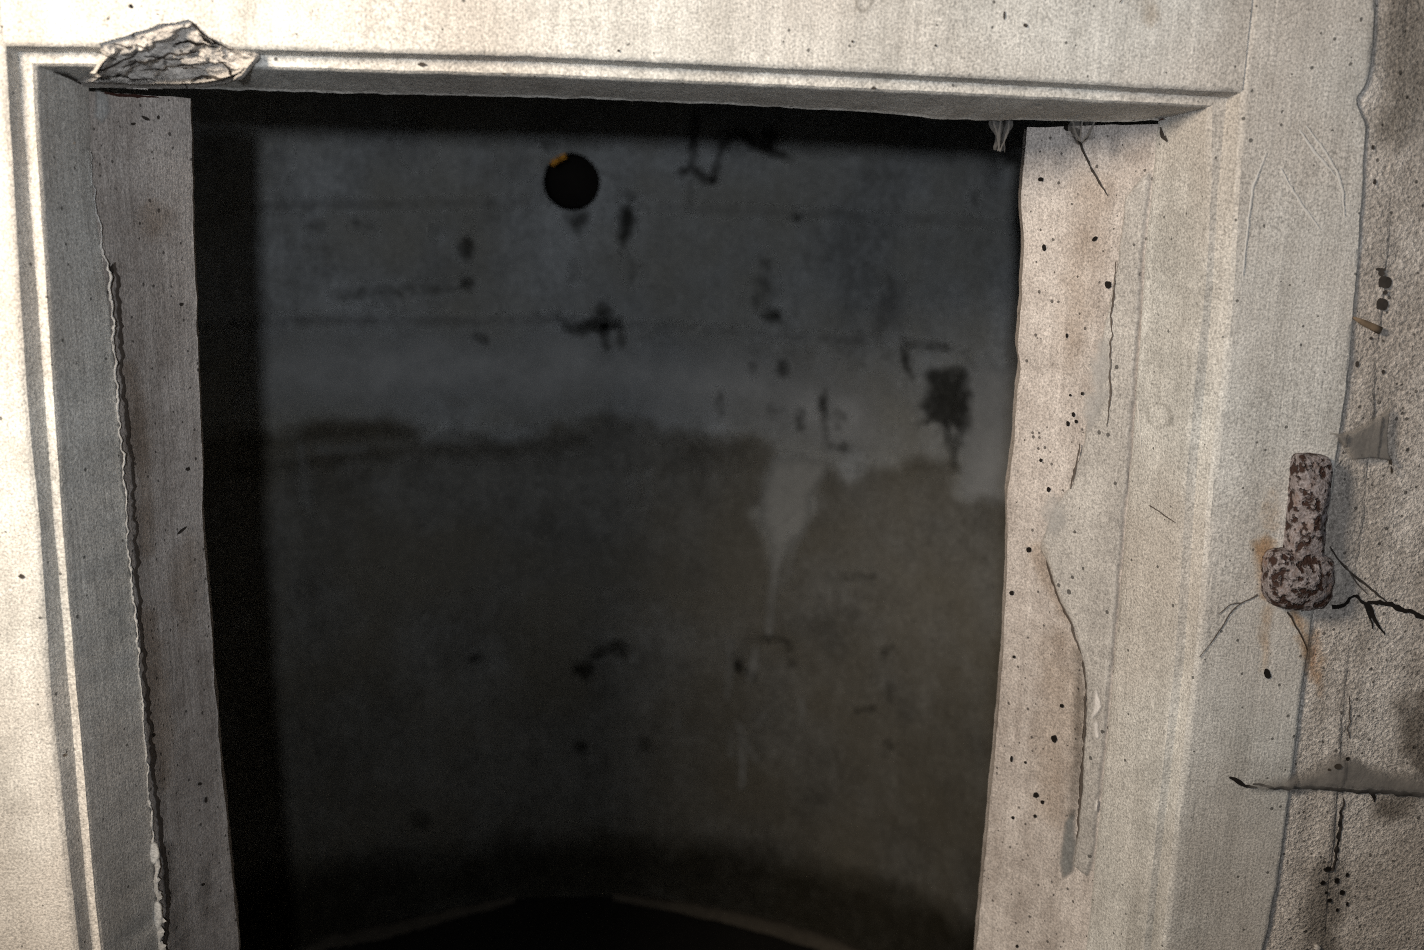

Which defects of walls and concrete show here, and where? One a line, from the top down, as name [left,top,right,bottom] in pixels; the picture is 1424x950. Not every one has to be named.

spalling [77,19,261,90]
leakage [923,365,1017,501]
leakage [761,457,826,634]
crack [1199,594,1308,657]
crack [1330,546,1424,635]